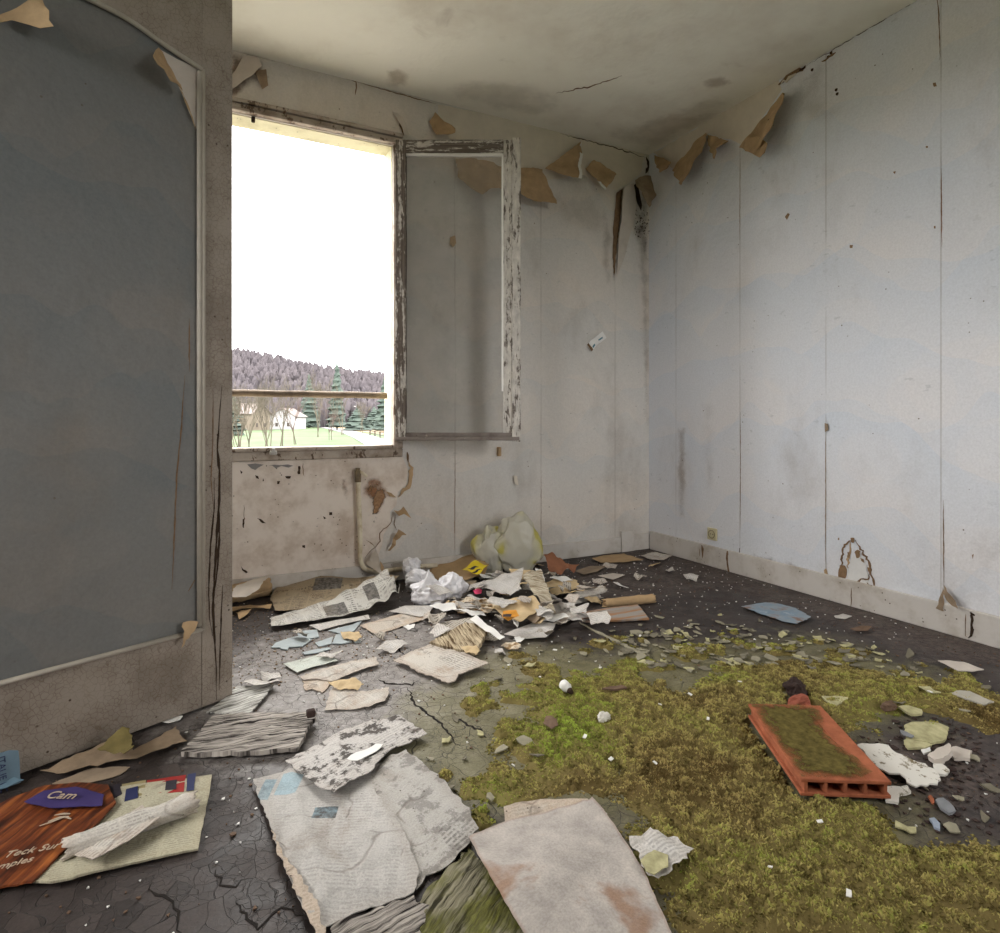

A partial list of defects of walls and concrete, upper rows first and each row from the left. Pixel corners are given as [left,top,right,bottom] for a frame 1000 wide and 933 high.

peeling [162,51,198,129]
crack [557,76,620,93]
flaking render [438,65,806,190]
crack [172,318,223,700]
flaking render [824,538,875,586]